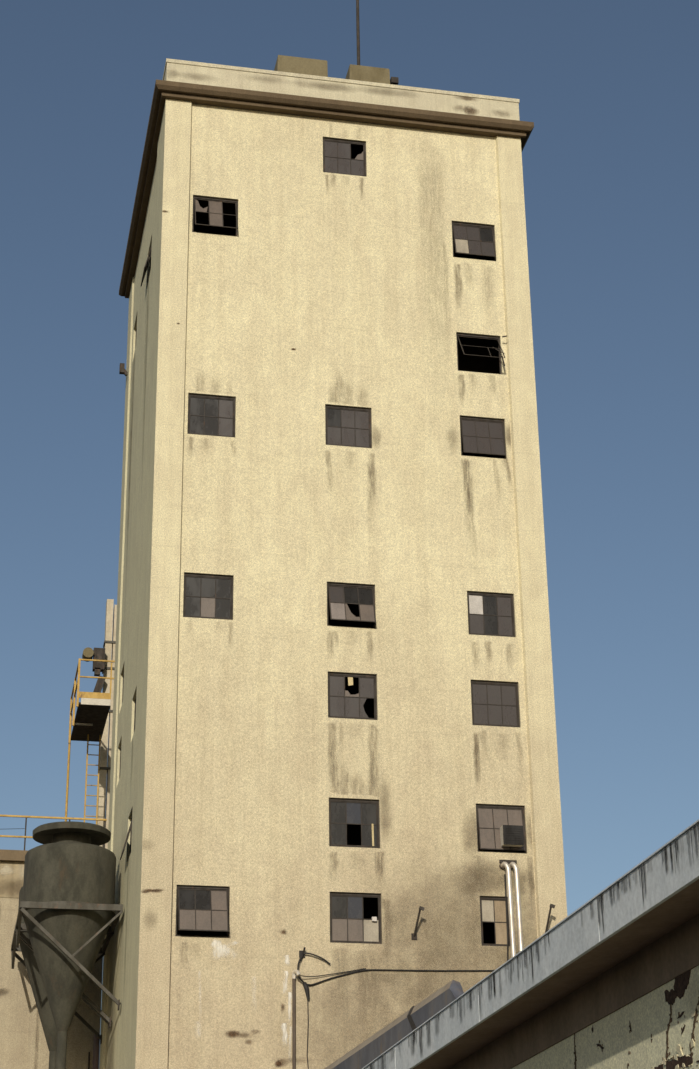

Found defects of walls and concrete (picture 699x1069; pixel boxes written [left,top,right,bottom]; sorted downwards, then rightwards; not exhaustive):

crack [665,996,699,1069]